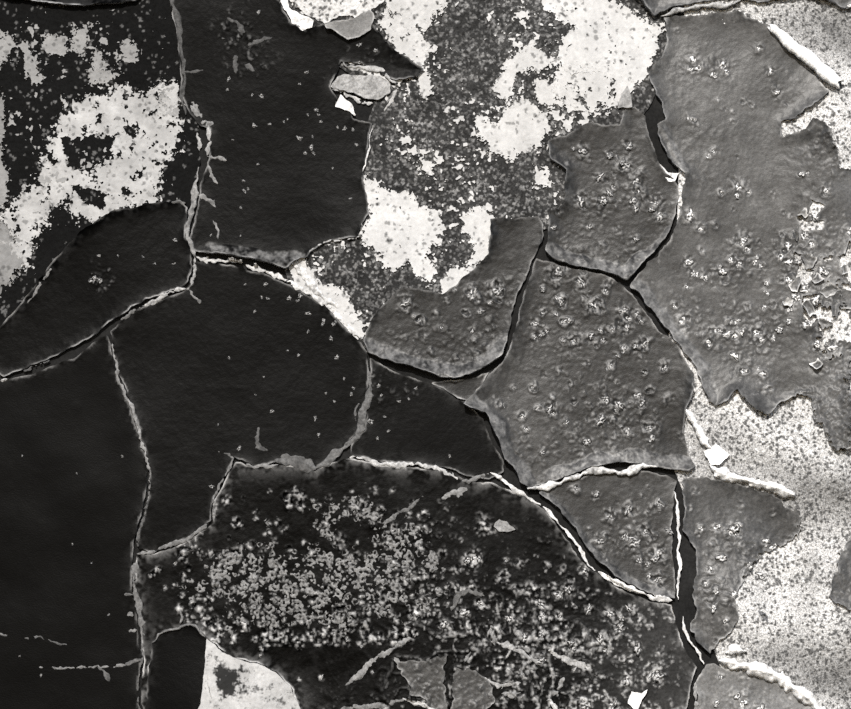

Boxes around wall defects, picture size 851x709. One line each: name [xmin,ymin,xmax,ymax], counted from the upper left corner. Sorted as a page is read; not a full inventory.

crack [1,360,50,382]
crack [27,268,52,303]
crack [121,0,362,337]
crack [363,128,373,170]
flaking render [0,0,737,552]
peeling [350,0,851,709]
crack [0,633,67,645]
peeling [0,334,147,709]
crack [39,344,682,709]
peeling [135,459,697,709]
crack [682,618,704,664]
crack [692,683,700,709]